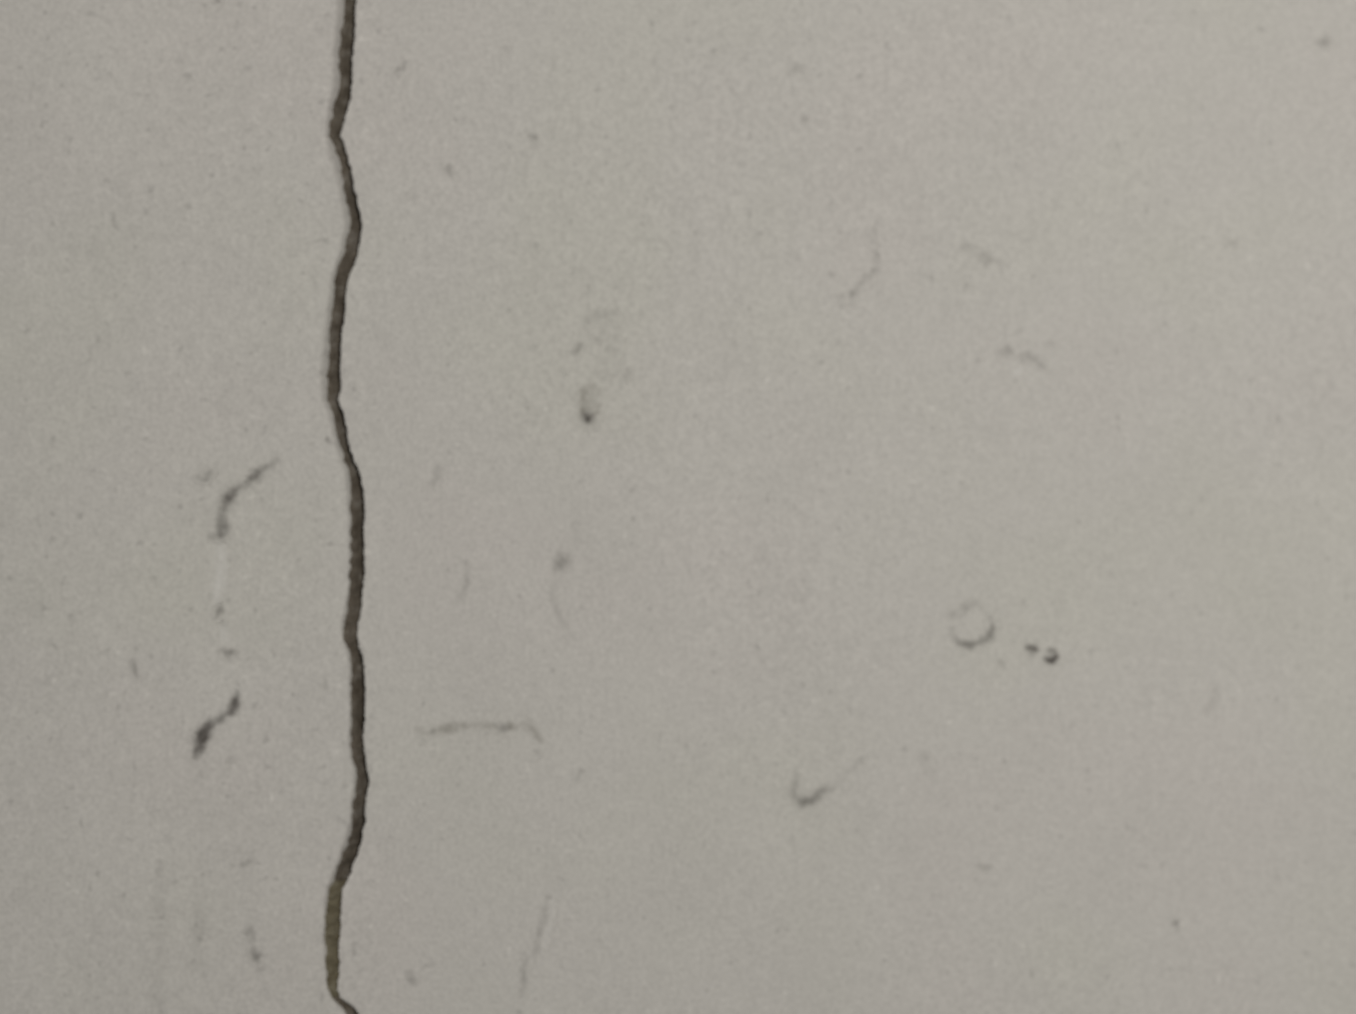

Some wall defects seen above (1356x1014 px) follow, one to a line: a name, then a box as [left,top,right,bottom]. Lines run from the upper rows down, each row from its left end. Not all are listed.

crack [316,0,370,1014]